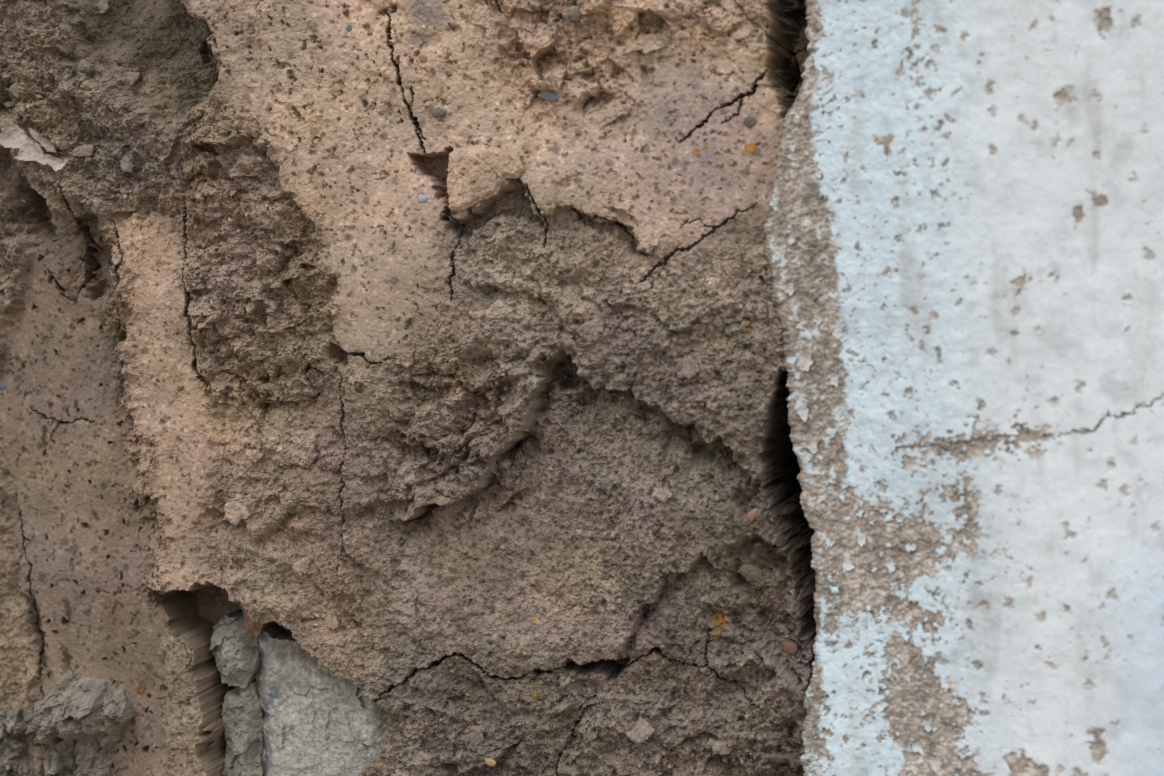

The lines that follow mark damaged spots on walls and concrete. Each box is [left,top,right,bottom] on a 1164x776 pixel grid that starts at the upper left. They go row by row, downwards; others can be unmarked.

peeling [1094,4,1142,40]
crack [387,13,426,151]
crack [679,72,767,143]
crack [449,215,466,300]
crack [576,209,639,243]
crack [640,204,757,283]
spalling [206,0,1131,776]
crack [891,395,1164,458]
peeling [1093,436,1152,512]
crack [373,653,575,703]
crack [623,629,763,711]
crack [555,706,590,775]